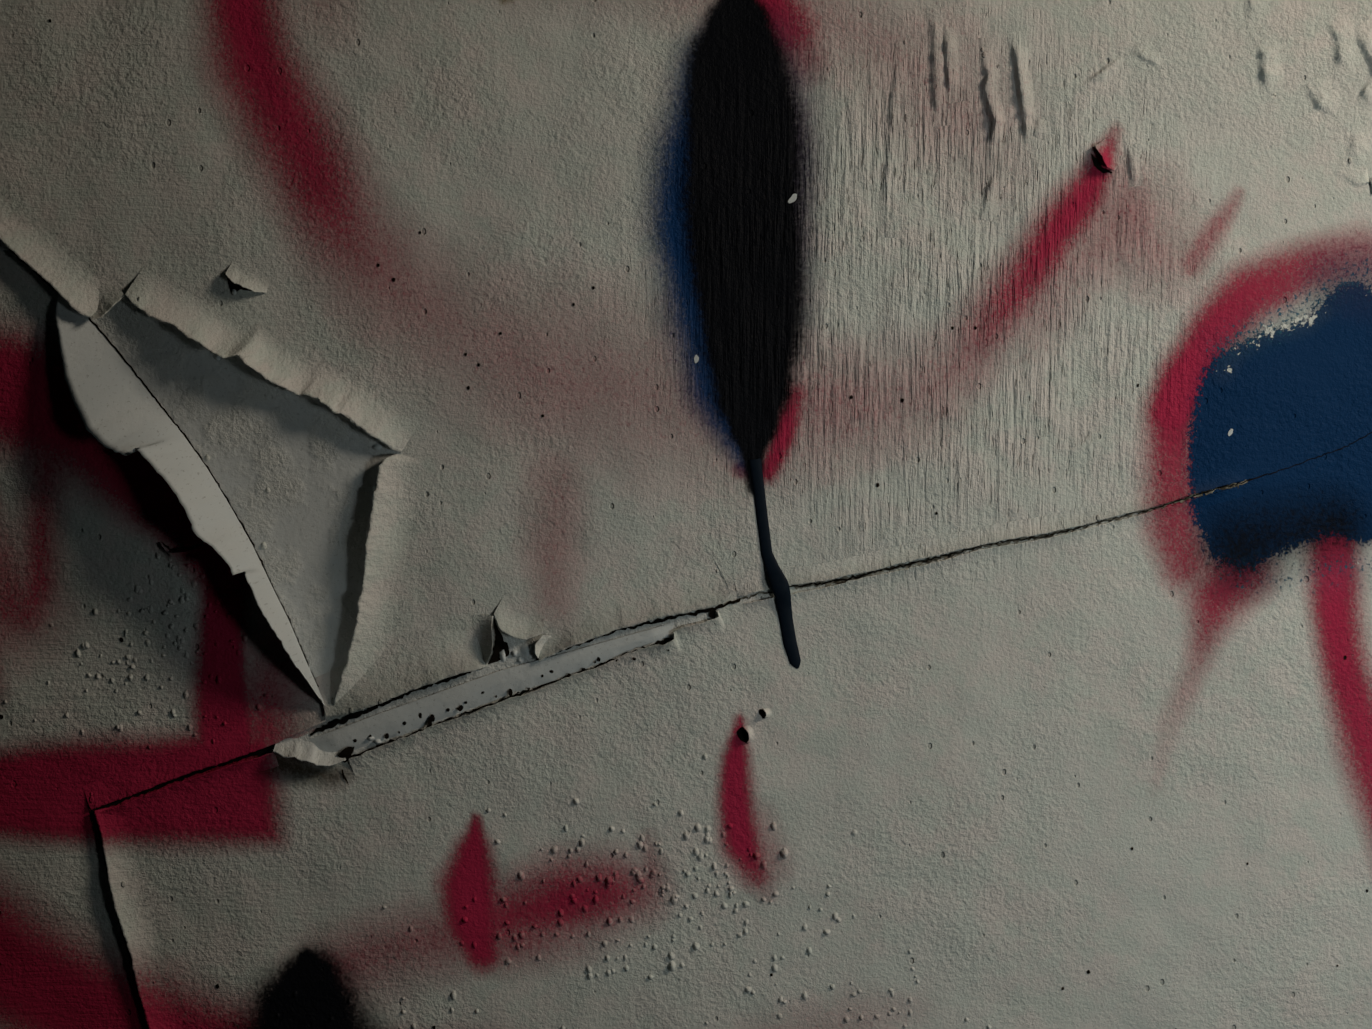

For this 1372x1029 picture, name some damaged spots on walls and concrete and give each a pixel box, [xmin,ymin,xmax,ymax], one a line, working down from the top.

peeling [0,191,740,785]
crack [734,432,1372,615]
crack [83,697,326,1029]